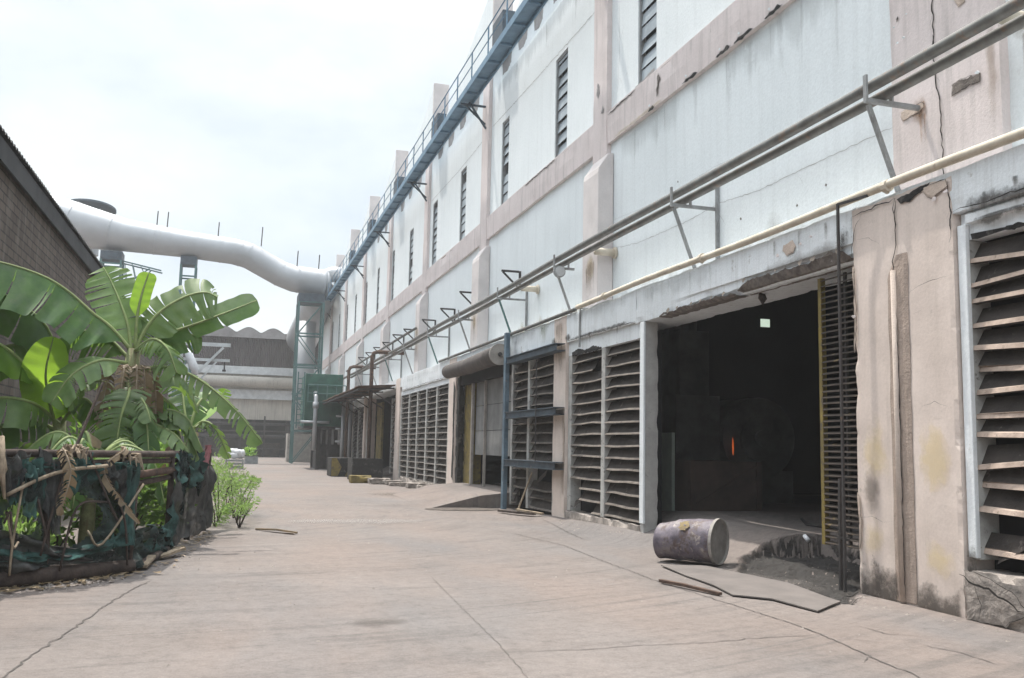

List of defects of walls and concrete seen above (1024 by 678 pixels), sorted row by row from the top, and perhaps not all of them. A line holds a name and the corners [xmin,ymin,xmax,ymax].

spalling [635,68,660,112]
spalling [951,71,981,96]
crack [931,0,1024,242]
spalling [897,179,948,204]
crack [851,198,896,269]
spalling [659,235,857,352]
leakage [861,562,898,602]
crack [960,574,1021,616]